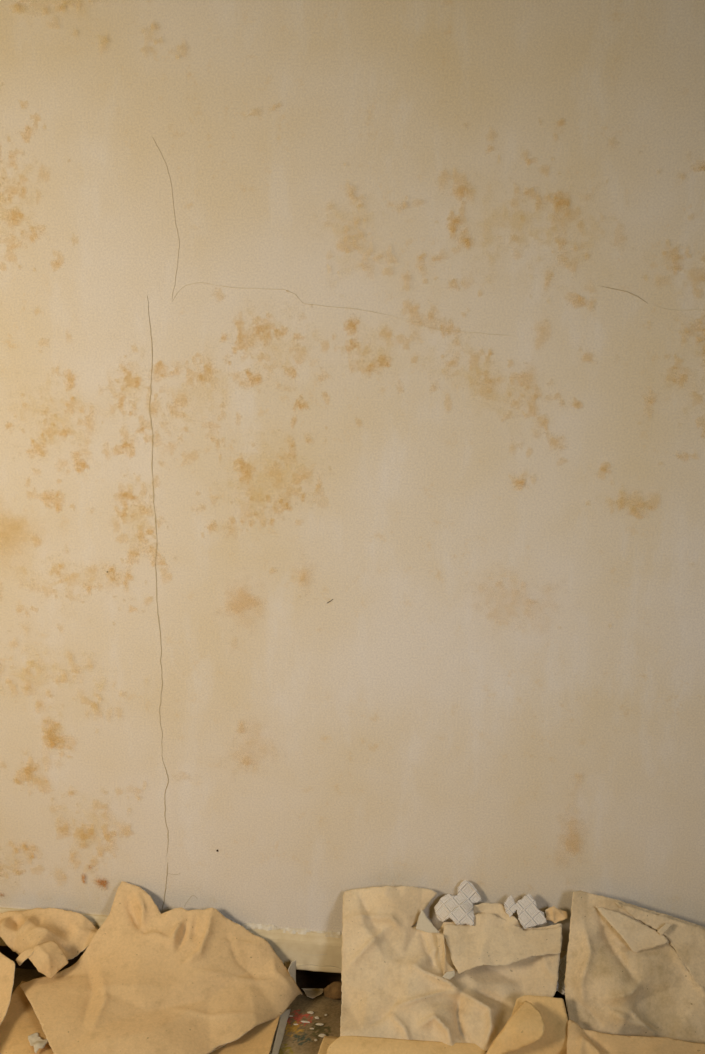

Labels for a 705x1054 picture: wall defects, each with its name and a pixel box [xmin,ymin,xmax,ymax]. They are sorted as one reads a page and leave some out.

crack [147,140,509,911]